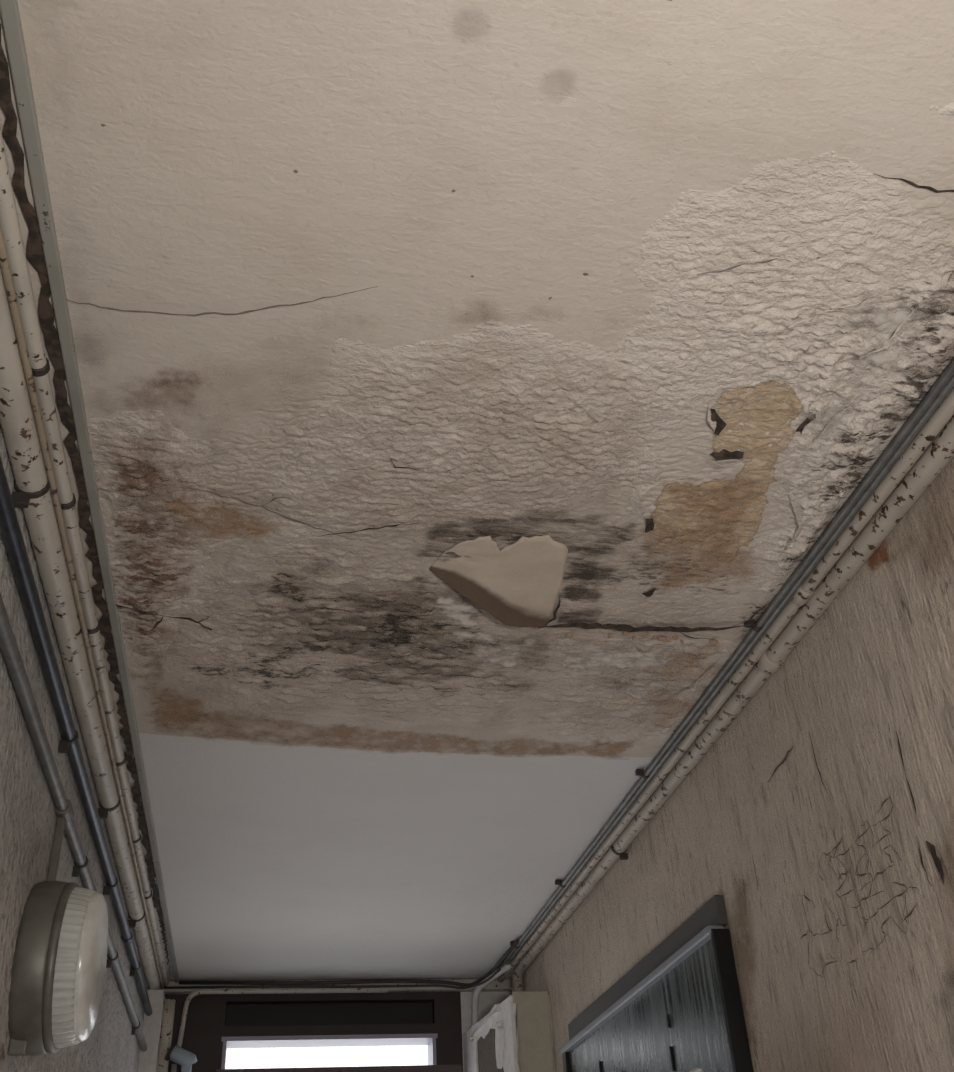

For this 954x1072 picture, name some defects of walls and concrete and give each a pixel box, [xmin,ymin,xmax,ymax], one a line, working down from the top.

crack [876,174,954,193]
crack [68,286,378,316]
spalling [630,230,954,612]
mould [812,282,954,501]
damp [118,463,156,497]
damp [112,501,265,640]
damp [268,573,303,601]
damp [422,518,591,557]
damp [561,527,740,623]
damp [192,597,491,689]
peeling [161,533,739,753]
damp [304,726,476,752]